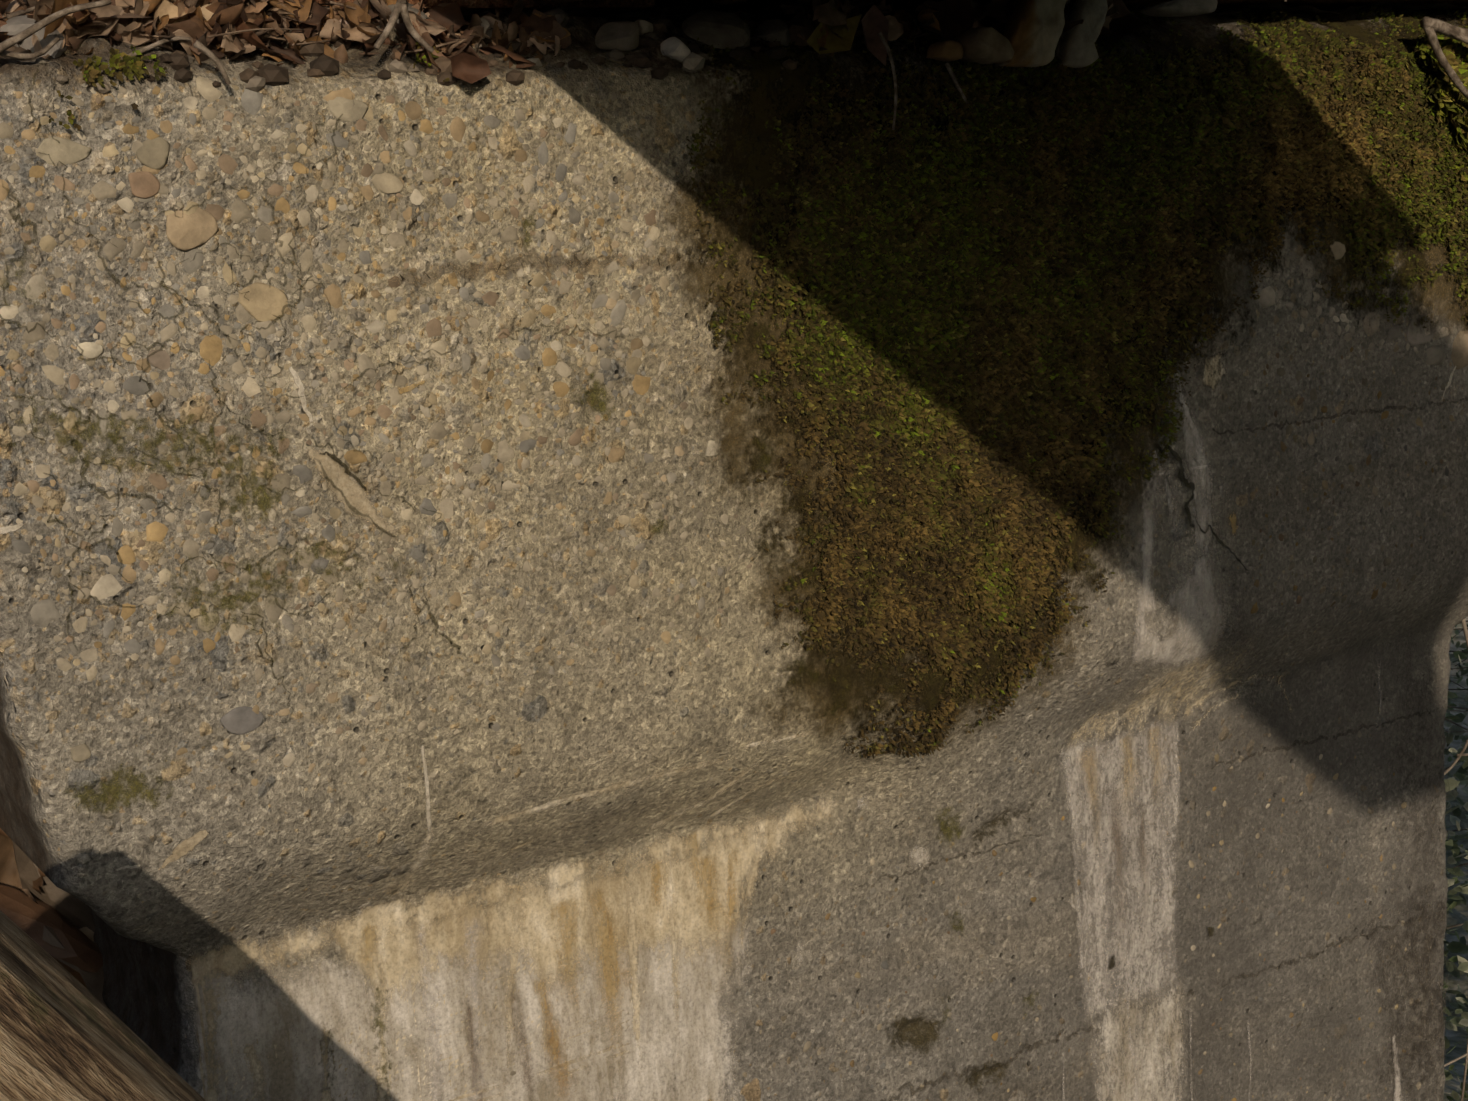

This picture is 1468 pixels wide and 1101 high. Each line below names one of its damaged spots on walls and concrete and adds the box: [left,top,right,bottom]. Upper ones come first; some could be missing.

water stain [1202,353,1225,389]
crack [1154,443,1248,571]
water stain [1065,370,1291,1101]
water stain [191,802,832,1101]
water stain [1371,905,1446,1101]